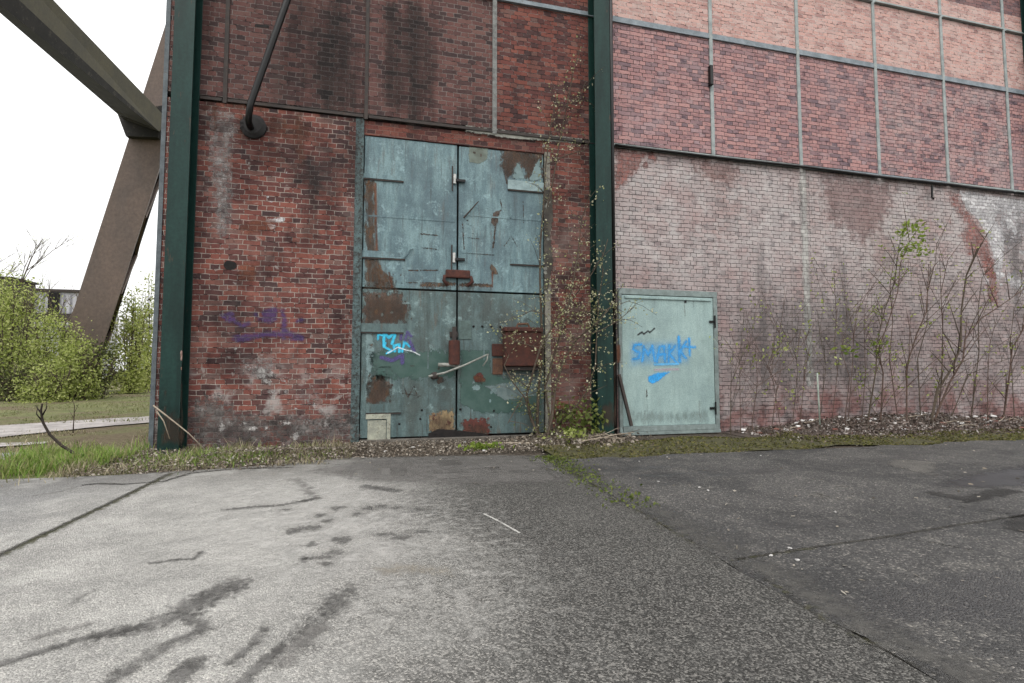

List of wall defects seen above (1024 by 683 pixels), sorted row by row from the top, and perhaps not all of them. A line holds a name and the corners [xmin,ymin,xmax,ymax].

corrosion [363,180,396,290]
peeling [462,127,553,302]
corrosion [428,410,491,438]